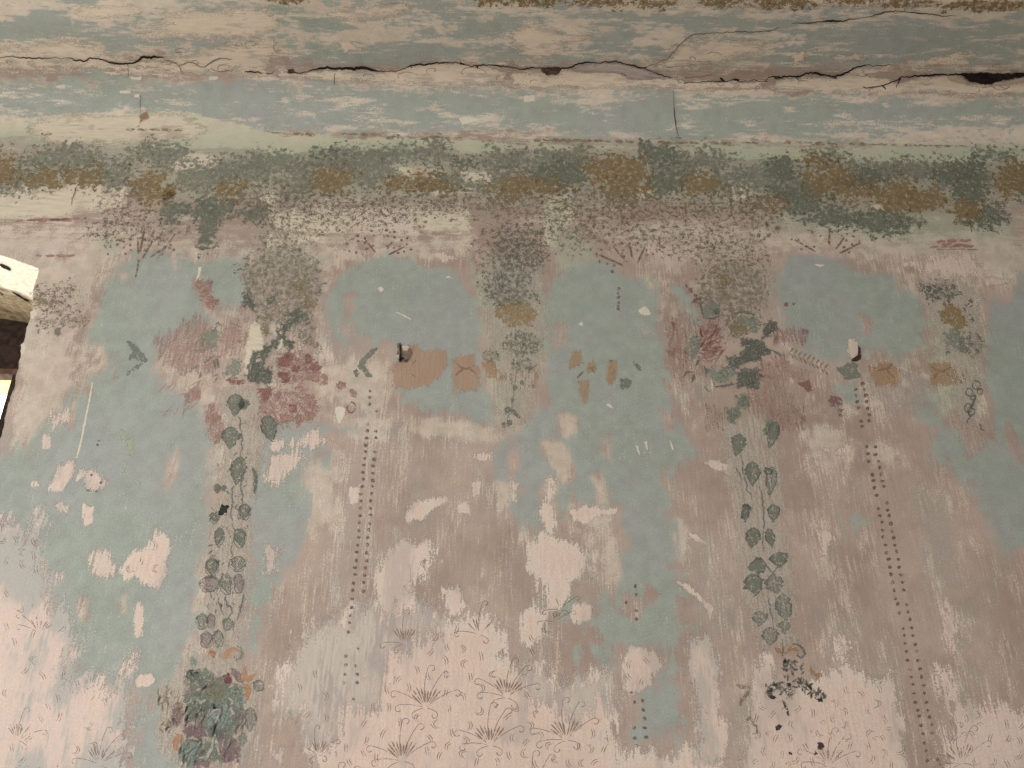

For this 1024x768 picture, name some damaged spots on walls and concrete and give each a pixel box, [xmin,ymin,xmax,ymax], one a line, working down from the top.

peeling [650,0,1024,14]
peeling [0,6,1024,103]
crack [3,10,1024,137]
peeling [25,110,208,150]
spalling [396,343,412,362]
spalling [846,337,861,361]
peeling [40,408,72,453]
peeling [262,423,333,489]
peeling [88,525,173,592]
peeling [0,459,155,768]
peeling [257,475,916,768]
peeling [920,596,1024,768]